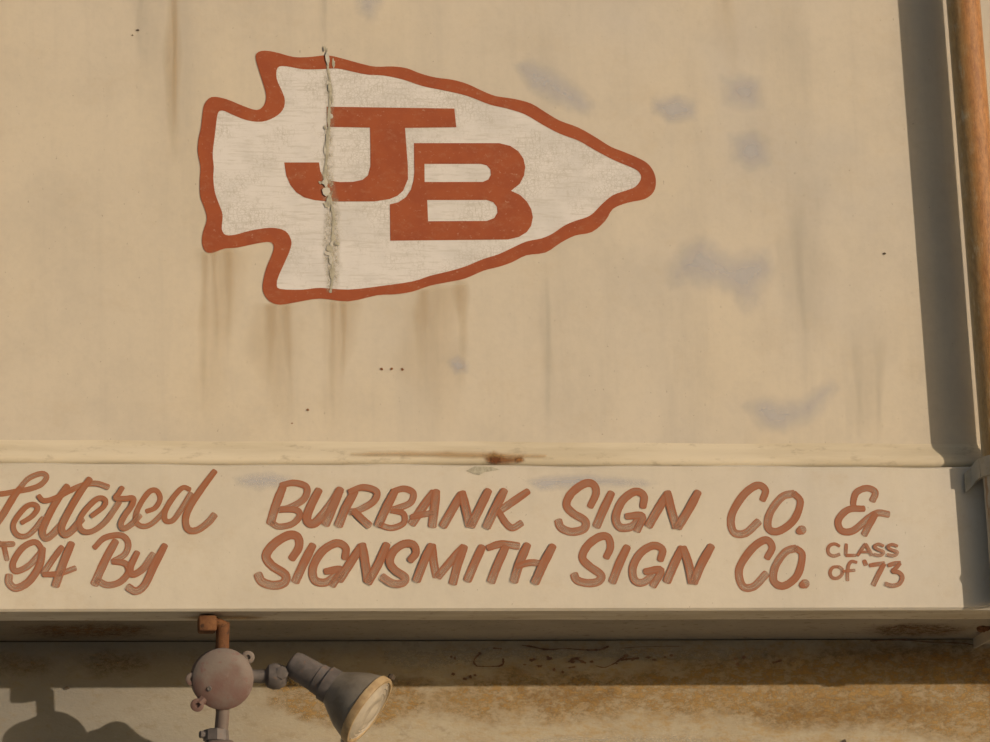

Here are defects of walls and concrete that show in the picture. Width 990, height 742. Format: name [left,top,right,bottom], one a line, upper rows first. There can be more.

crack [319,45,340,293]
corrosion [486,453,523,464]
corrosion [437,644,990,736]